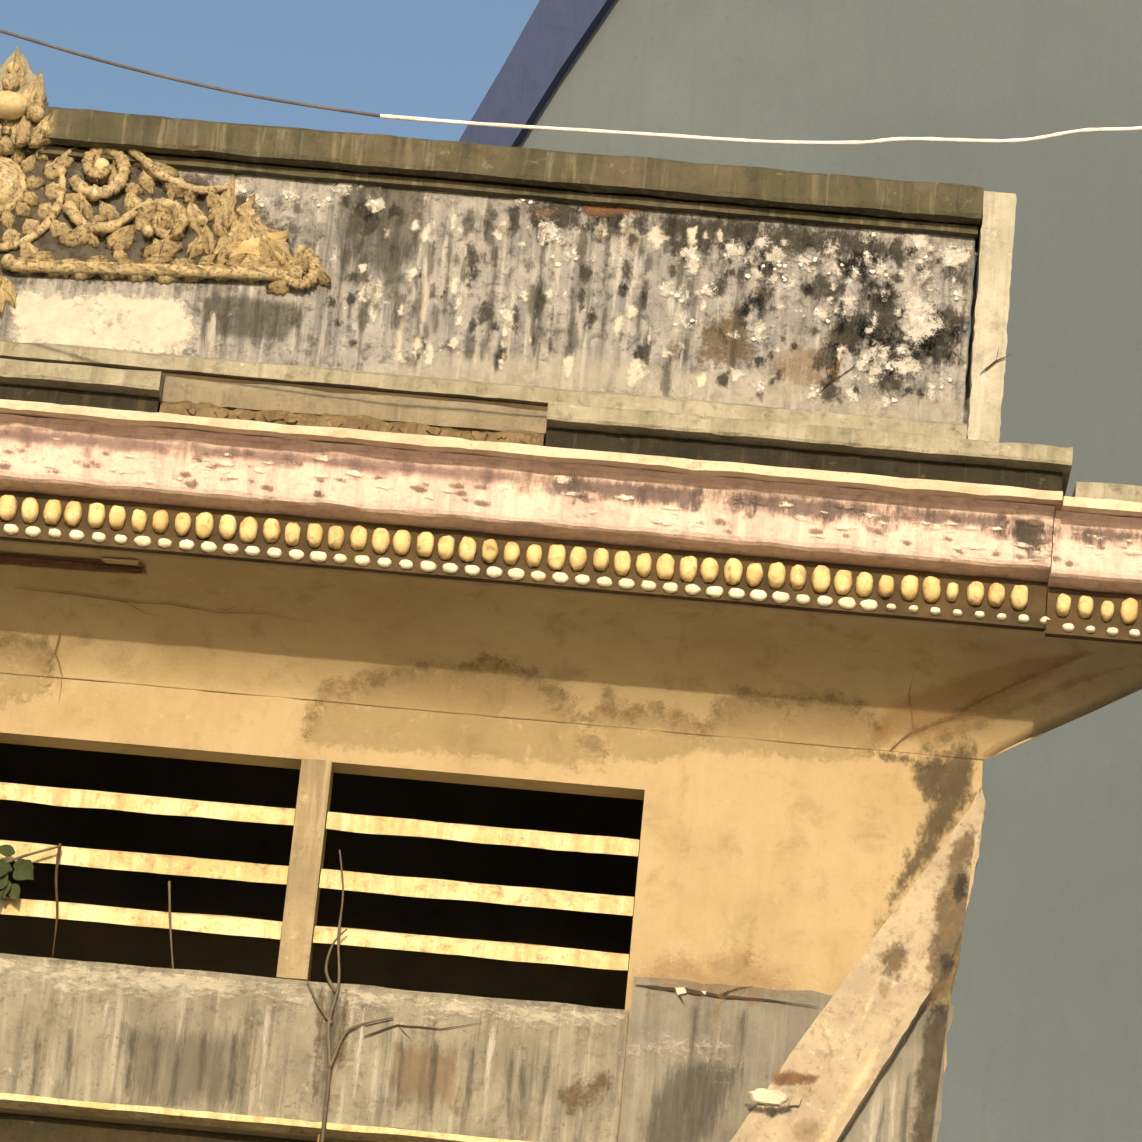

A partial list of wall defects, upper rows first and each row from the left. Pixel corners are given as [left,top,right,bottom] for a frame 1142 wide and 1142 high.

damp [463,244,486,291]
damp [492,200,648,296]
damp [328,272,359,326]
damp [463,289,519,338]
damp [576,264,597,329]
damp [665,214,972,407]
damp [0,428,167,453]
damp [192,443,513,481]
damp [543,475,884,526]
damp [897,505,1142,558]
damp [869,747,975,1142]
damp [0,959,235,1016]